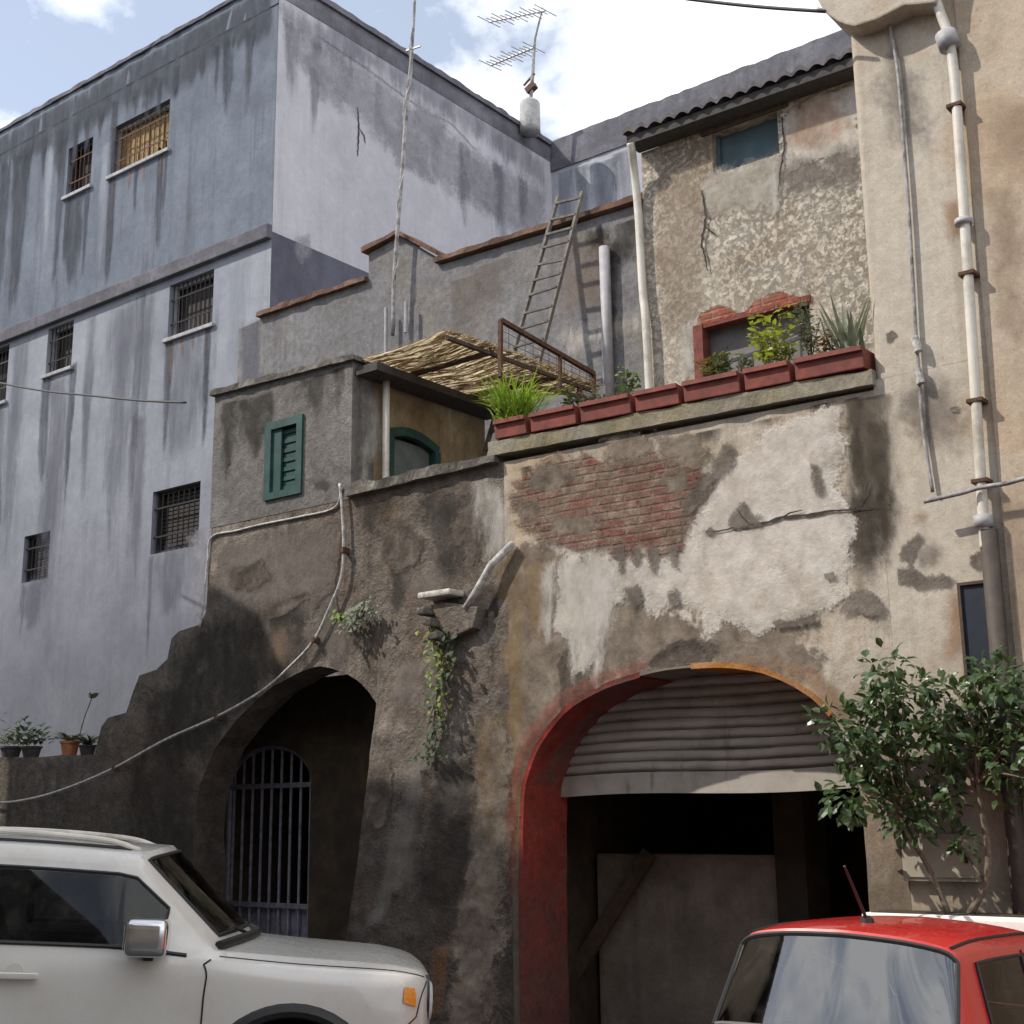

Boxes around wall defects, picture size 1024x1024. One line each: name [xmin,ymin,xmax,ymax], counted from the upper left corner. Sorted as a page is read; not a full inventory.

crack [319,37,477,156]
leakage [0,0,270,296]
crack [768,118,786,191]
crack [700,190,716,271]
flaking render [696,291,809,325]
leakage [66,391,74,477]
leakage [164,341,172,437]
leakage [202,329,210,435]
leakage [221,391,272,468]
crack [713,481,877,532]
leakage [847,394,894,571]
peeling [440,428,828,1024]